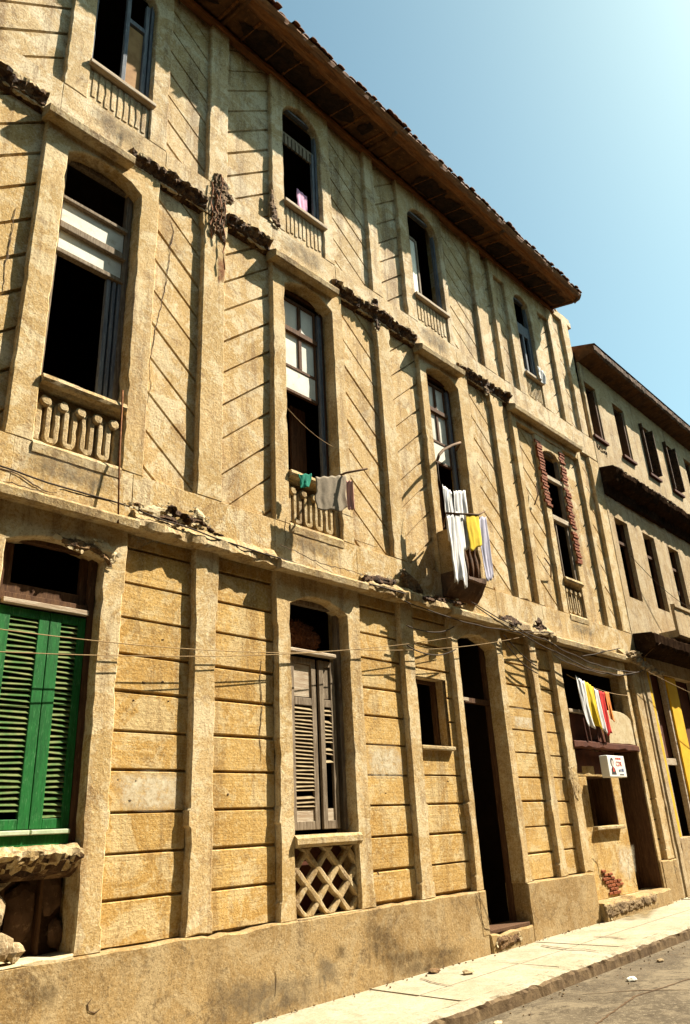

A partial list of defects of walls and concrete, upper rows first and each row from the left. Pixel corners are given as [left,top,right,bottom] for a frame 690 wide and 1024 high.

spalling [203,173,236,270]
spalling [269,189,281,229]
spalling [372,298,396,332]
spalling [123,502,225,537]
spalling [53,533,122,569]
spalling [359,568,467,607]
spalling [501,615,522,629]
spalling [535,617,551,642]
spalling [601,869,657,920]